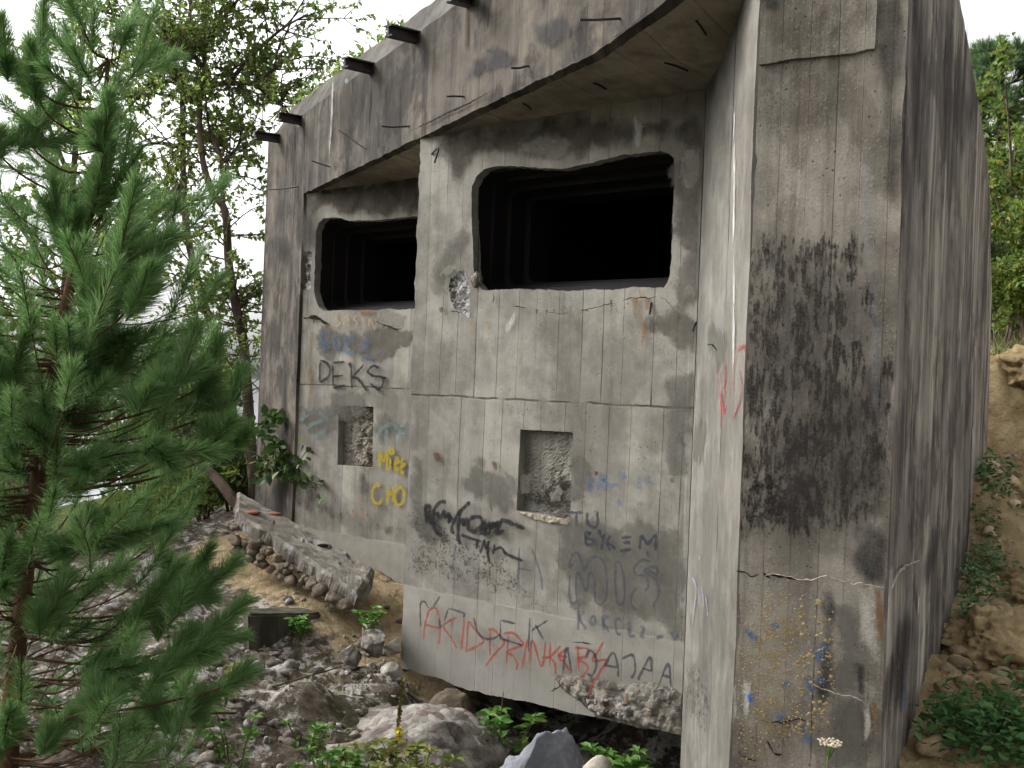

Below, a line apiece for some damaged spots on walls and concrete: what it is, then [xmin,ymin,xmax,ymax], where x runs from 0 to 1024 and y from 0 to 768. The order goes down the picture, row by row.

spalling [444,265,483,313]
damp [740,232,894,540]
spalling [516,511,569,525]
crack [736,559,921,589]
spalling [552,674,682,735]